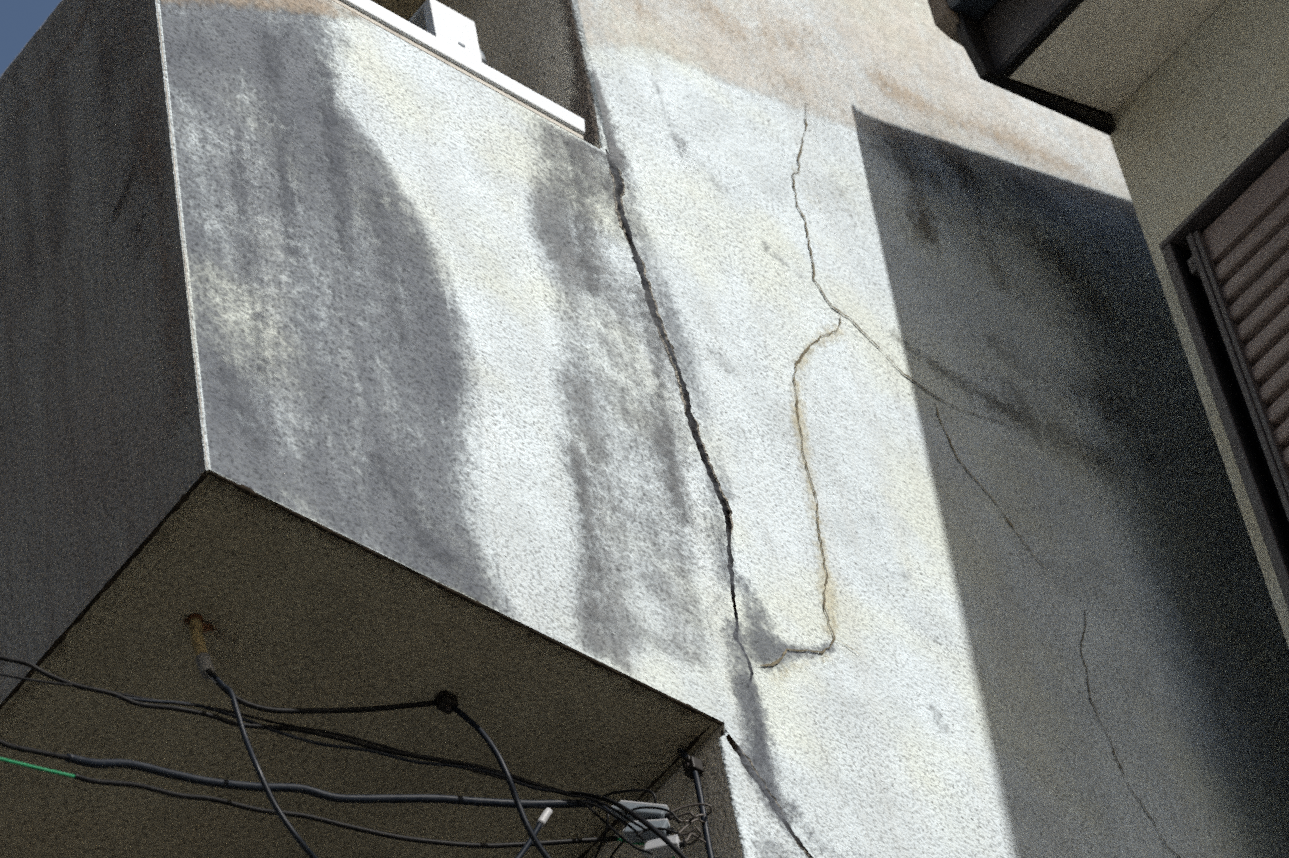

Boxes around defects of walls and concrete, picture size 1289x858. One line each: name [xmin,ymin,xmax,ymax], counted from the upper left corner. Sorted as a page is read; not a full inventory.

water stain [0,0,722,802]
crack [606,103,1047,679]
crack [720,729,813,858]
crack [1080,607,1181,858]